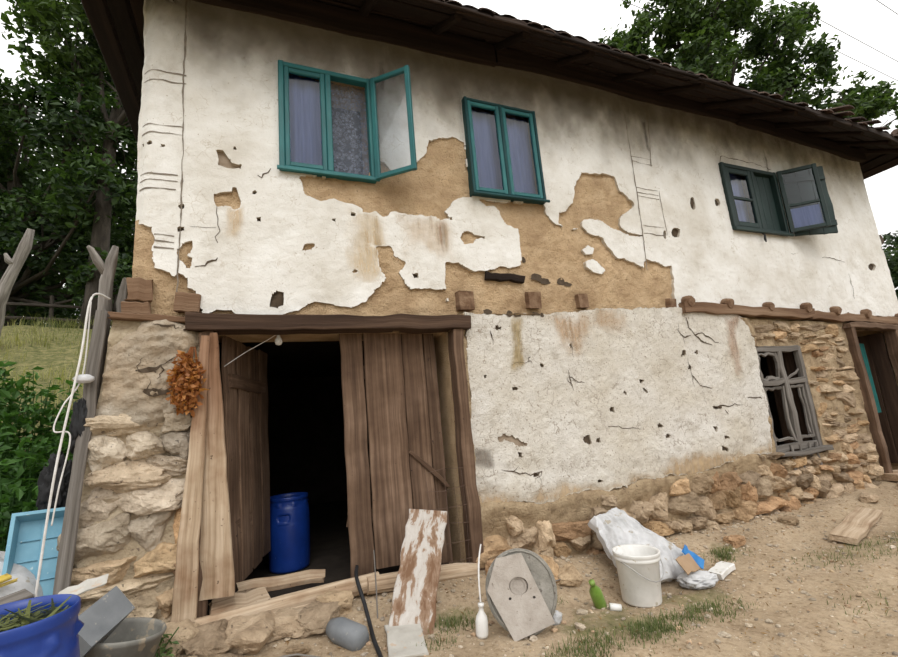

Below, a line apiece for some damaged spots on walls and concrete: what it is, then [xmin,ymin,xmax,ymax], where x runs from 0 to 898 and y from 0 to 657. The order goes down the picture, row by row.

flaking render [132,220,196,317]
crack [192,208,220,267]
flaking render [214,189,241,210]
flaking render [217,148,241,169]
flaking render [299,137,470,220]
flaking render [270,174,672,317]
leakage [513,322,523,368]
crack [678,318,762,413]